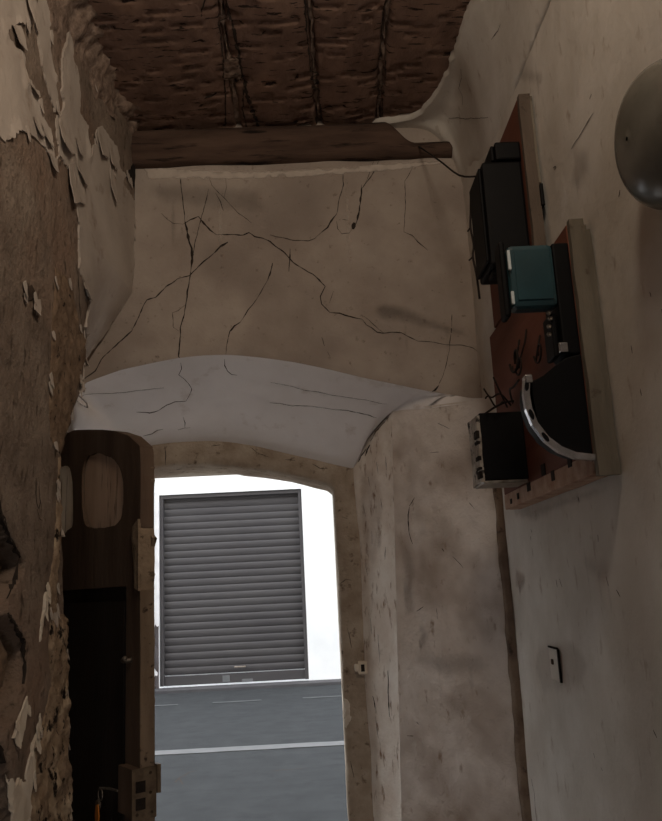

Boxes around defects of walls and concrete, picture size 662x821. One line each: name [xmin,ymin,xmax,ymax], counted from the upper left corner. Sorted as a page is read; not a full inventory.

peeling [0,0,137,821]
crack [85,161,477,436]
crack [271,382,386,486]